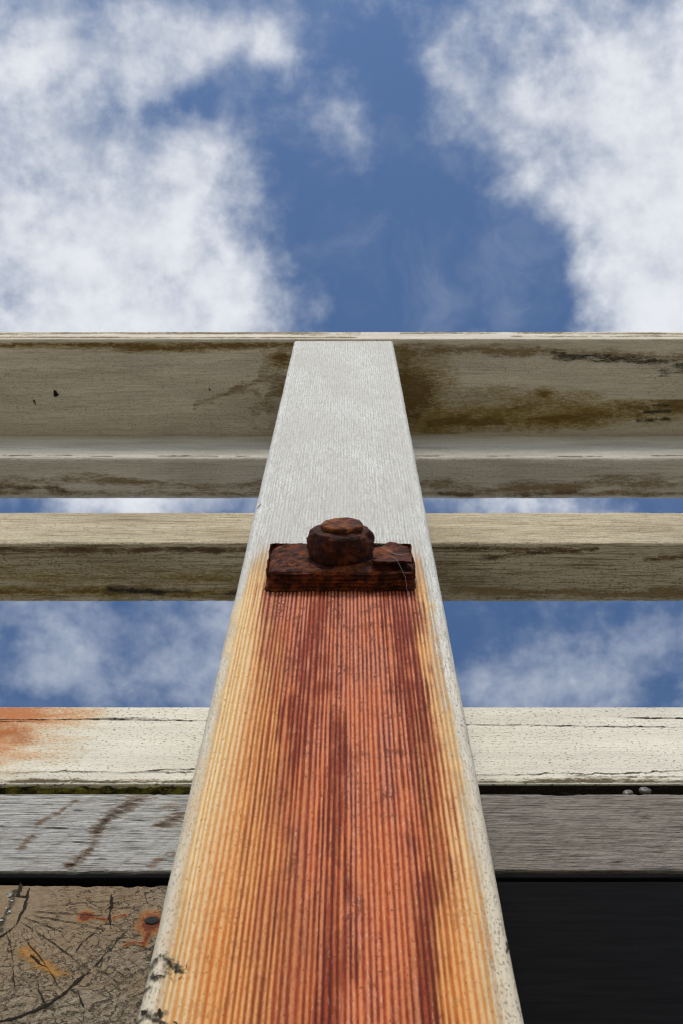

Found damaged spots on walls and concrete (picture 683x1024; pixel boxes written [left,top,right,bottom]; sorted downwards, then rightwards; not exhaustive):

water stain [394,343,683,434]
rust [0,707,100,763]
crack [0,715,207,723]
crack [467,717,681,727]
crack [0,766,195,774]
rust [159,552,497,1024]
crack [478,769,682,777]
water stain [14,817,52,850]
water stain [62,795,187,869]
rust [77,910,127,922]
rust [123,912,161,947]
crack [0,882,203,1024]